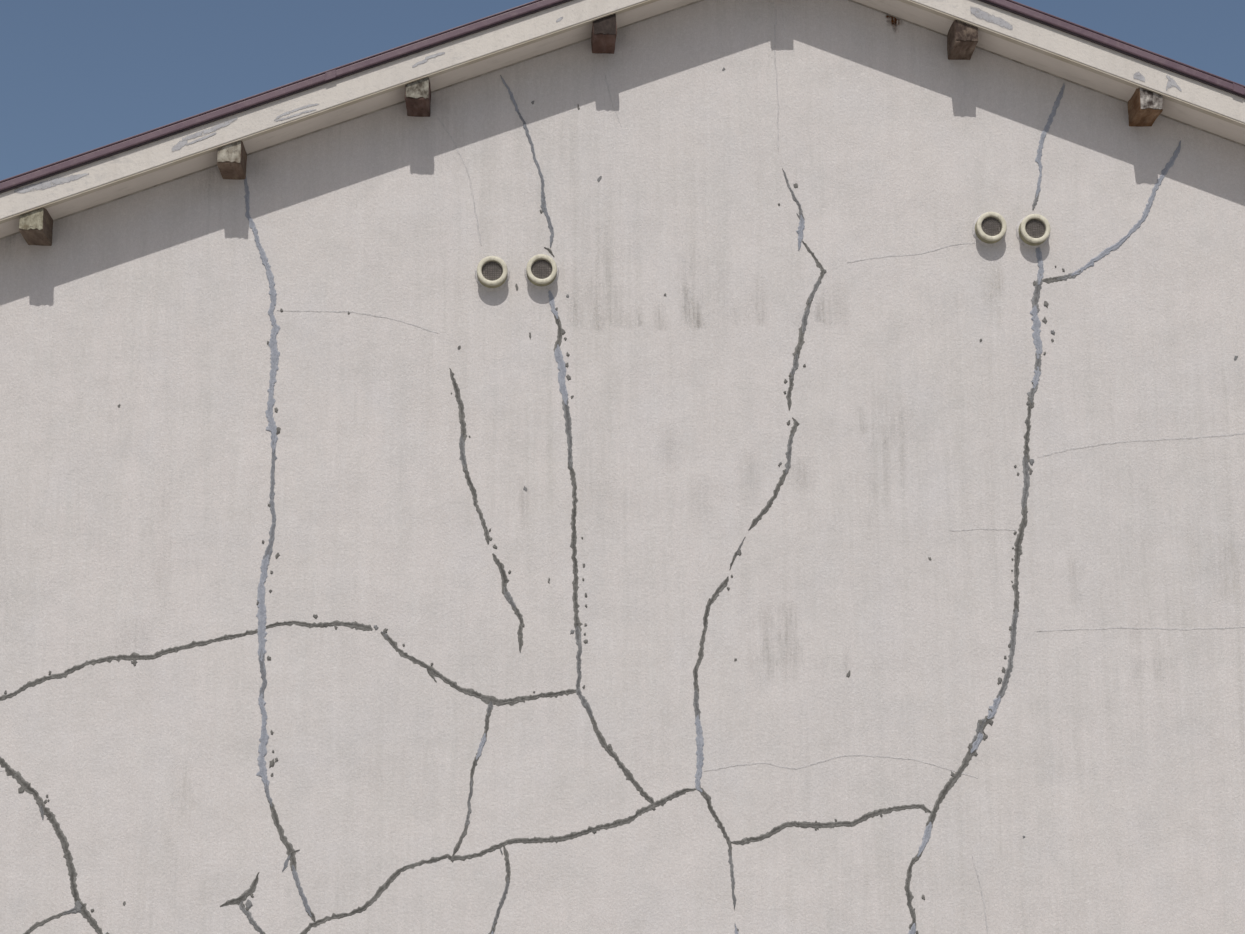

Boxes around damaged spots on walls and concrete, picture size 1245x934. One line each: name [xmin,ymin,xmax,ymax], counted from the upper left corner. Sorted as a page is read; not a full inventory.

crack [500,75,555,257]
crack [1032,83,1065,210]
crack [1039,432,1245,457]
crack [0,177,696,934]
crack [693,141,1181,934]
crack [1037,625,1245,633]